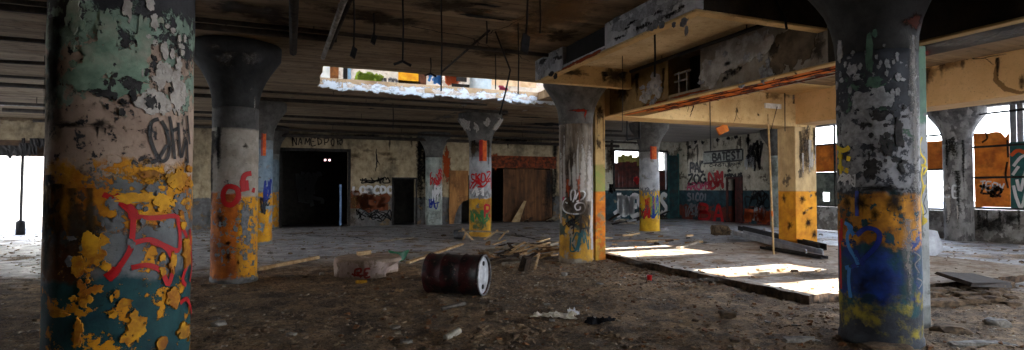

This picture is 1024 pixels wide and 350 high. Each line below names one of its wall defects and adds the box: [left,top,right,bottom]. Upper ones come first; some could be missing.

peeling [62,0,188,137]
peeling [624,29,908,180]
peeling [49,165,193,345]
peeling [215,202,255,280]
peeling [155,321,191,350]